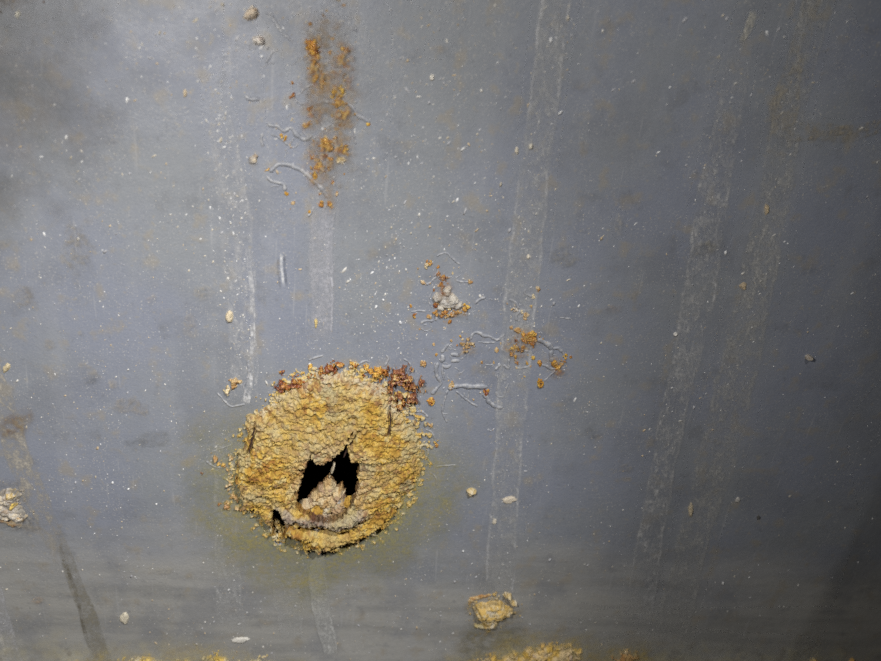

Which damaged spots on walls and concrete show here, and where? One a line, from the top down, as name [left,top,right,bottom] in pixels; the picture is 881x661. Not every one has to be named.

corrosion [249,22,370,222]
corrosion [200,252,574,586]
corrosion [117,650,268,661]
corrosion [458,641,590,661]